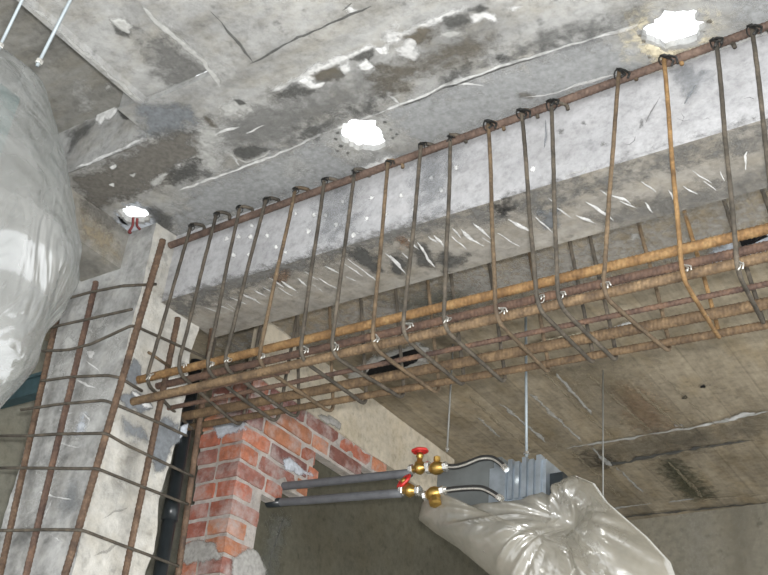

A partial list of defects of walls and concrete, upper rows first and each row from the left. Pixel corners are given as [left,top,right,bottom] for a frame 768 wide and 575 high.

leakage [146,38,206,84]
crack [210,3,371,64]
spalling [633,21,691,63]
leakage [71,90,129,148]
leakage [215,38,490,149]
crack [180,24,639,190]
leakage [73,103,211,255]
spalling [714,234,768,255]
flaking render [120,358,153,413]
spalling [348,343,429,379]
flaking render [123,417,188,472]
crack [570,411,768,466]